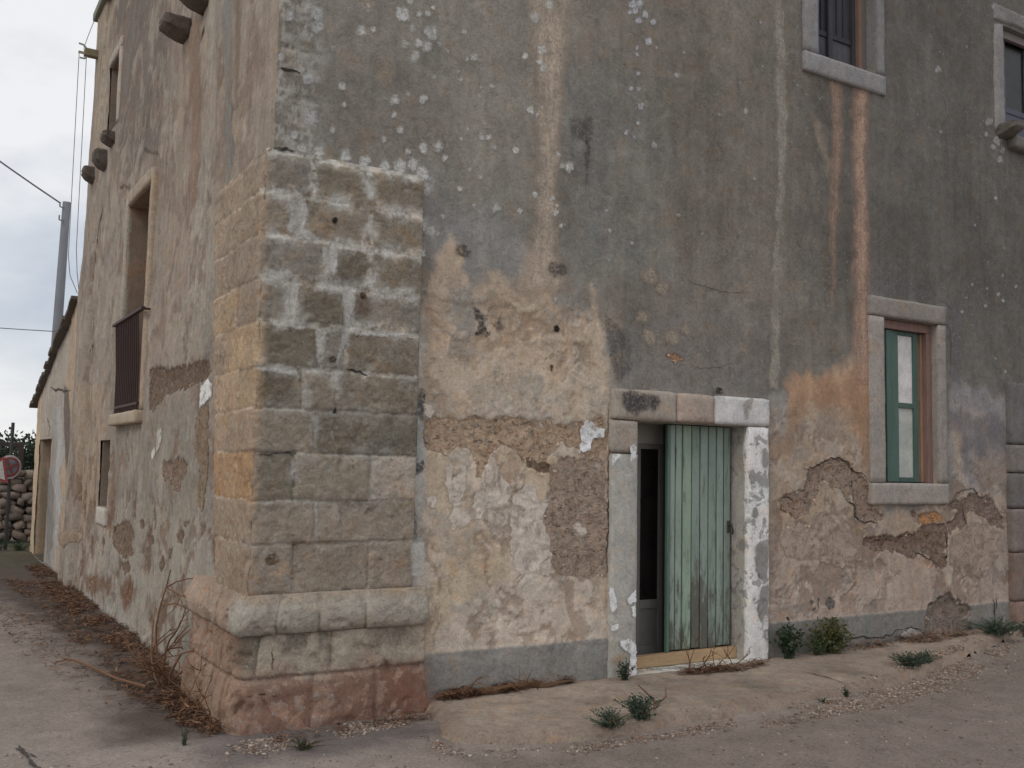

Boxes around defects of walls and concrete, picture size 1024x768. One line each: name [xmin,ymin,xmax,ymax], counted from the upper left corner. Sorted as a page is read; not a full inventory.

water stain [516,0,570,293]
rust [830,82,869,382]
flaking render [112,519,154,576]
flaking render [159,521,189,571]
flaking render [149,359,212,512]
flaking render [423,403,637,676]
water stain [623,389,661,415]
peeling [750,442,769,484]
peeling [753,458,1005,622]
flaking render [924,592,972,636]